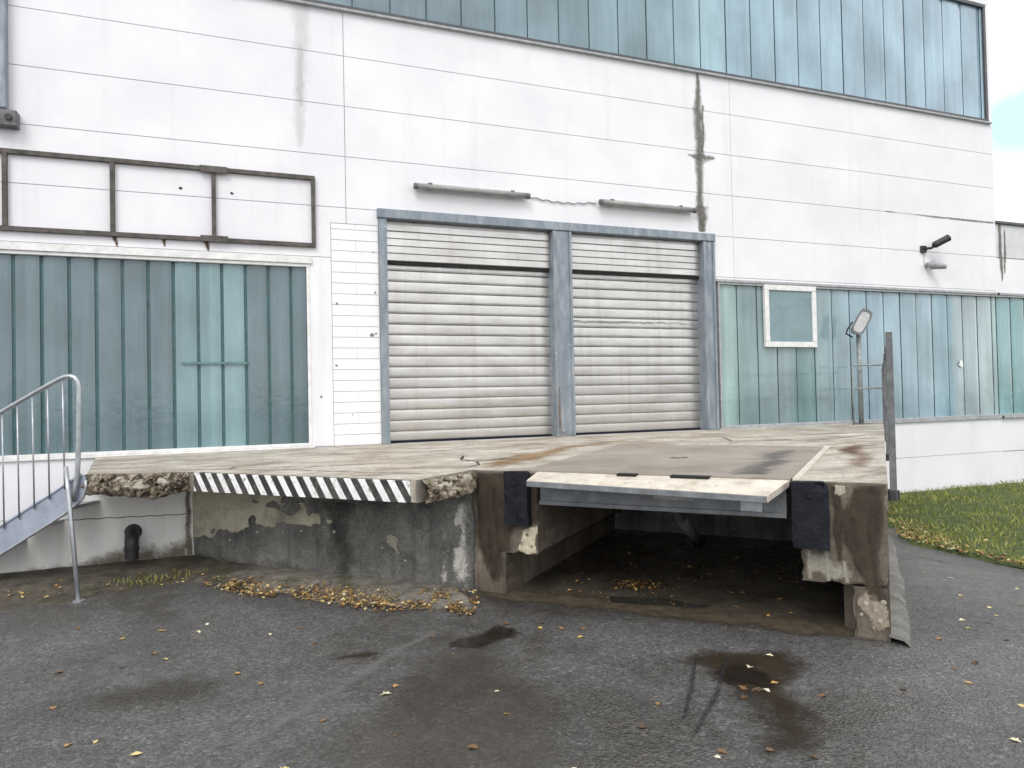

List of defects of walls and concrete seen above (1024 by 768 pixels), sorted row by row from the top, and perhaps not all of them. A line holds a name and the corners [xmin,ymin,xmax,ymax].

flaking render [81,472,336,541]
water stain [330,502,350,571]
spalling [422,471,477,504]
water stain [441,472,515,582]
spalling [518,526,538,554]
water stain [807,486,886,605]
spalling [857,591,890,630]